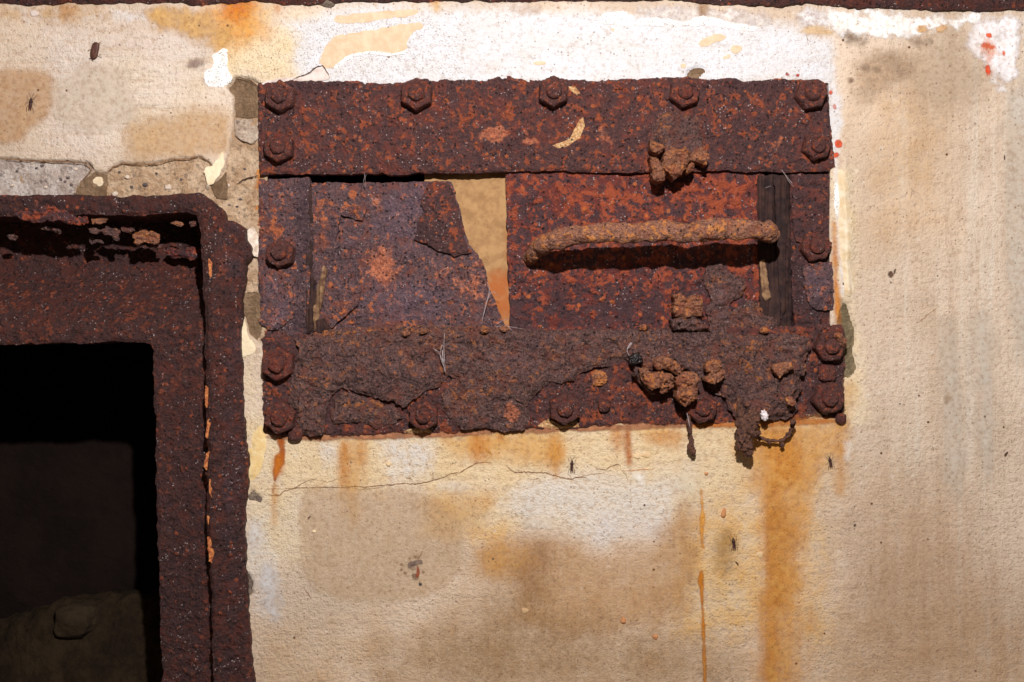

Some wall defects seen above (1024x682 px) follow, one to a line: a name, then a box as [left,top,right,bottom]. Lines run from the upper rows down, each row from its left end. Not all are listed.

rust [147,2,254,46]
spalling [0,9,423,357]
rust [14,204,201,261]
crack [269,462,649,496]
rust [270,422,736,481]
rust [751,413,846,682]
rust [698,571,707,682]